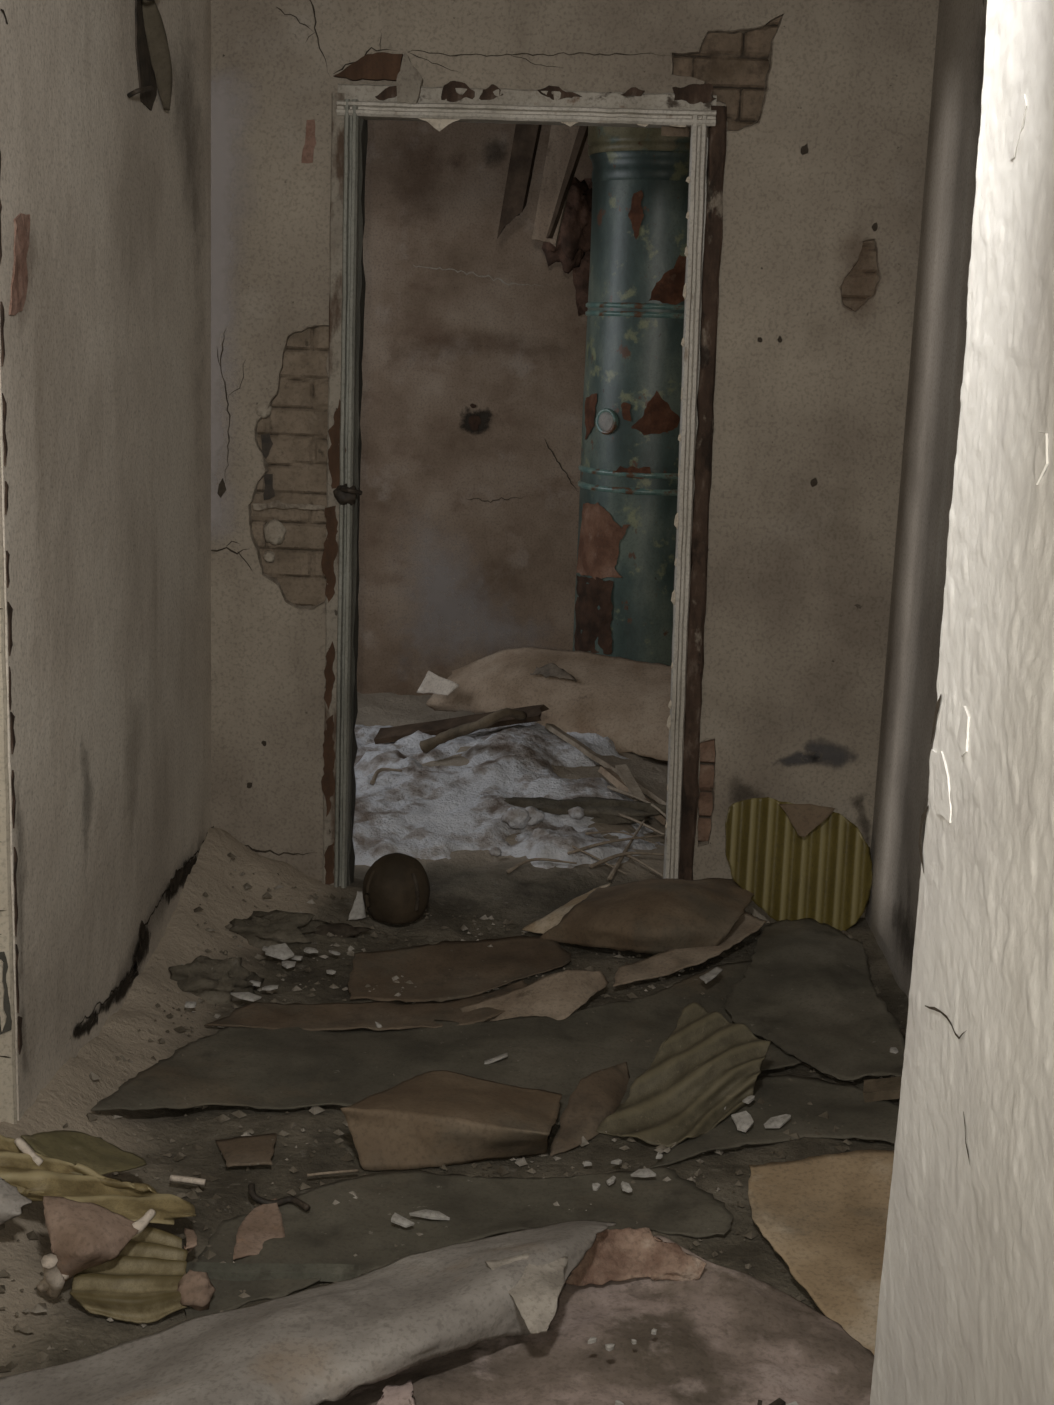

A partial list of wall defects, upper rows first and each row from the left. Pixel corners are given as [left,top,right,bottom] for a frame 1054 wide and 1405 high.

crack [277,0,680,74]
spalling [670,13,784,133]
spalling [637,124,708,137]
spalling [9,213,30,315]
spalling [839,222,882,313]
spalling [248,324,346,611]
leakage [779,743,854,766]
crack [245,845,309,856]
crack [70,832,208,1039]